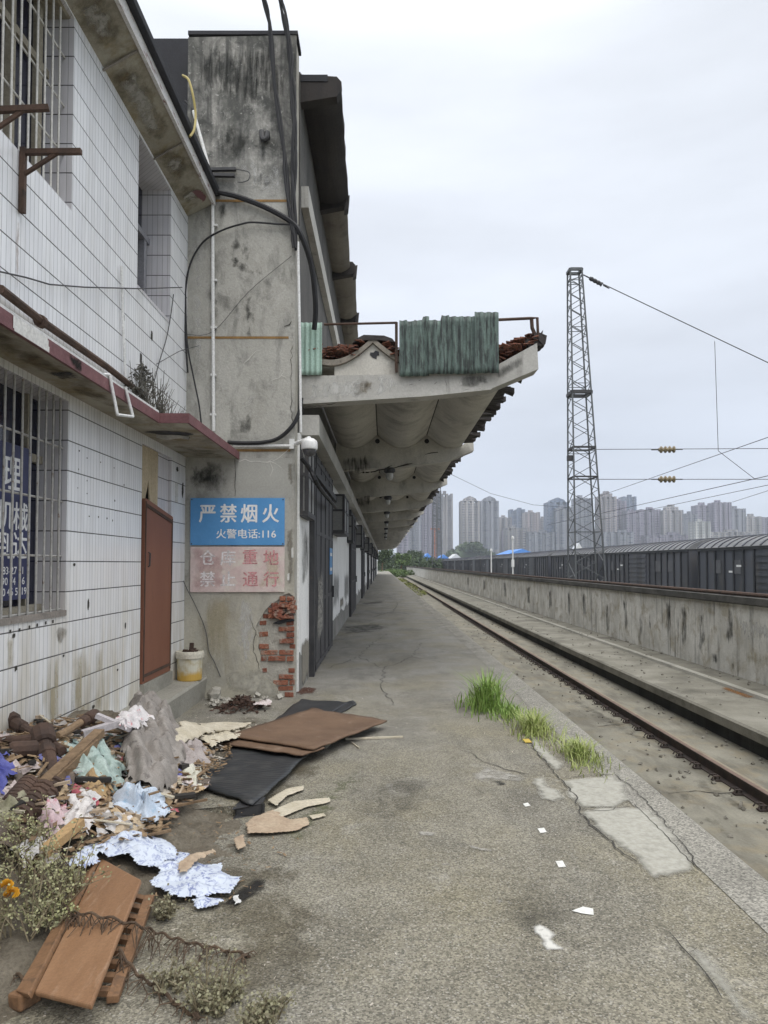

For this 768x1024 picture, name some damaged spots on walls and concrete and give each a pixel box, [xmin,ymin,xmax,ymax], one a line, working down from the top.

water stain [204,50,278,99]
spalling [257,593,309,697]
crack [459,738,700,869]